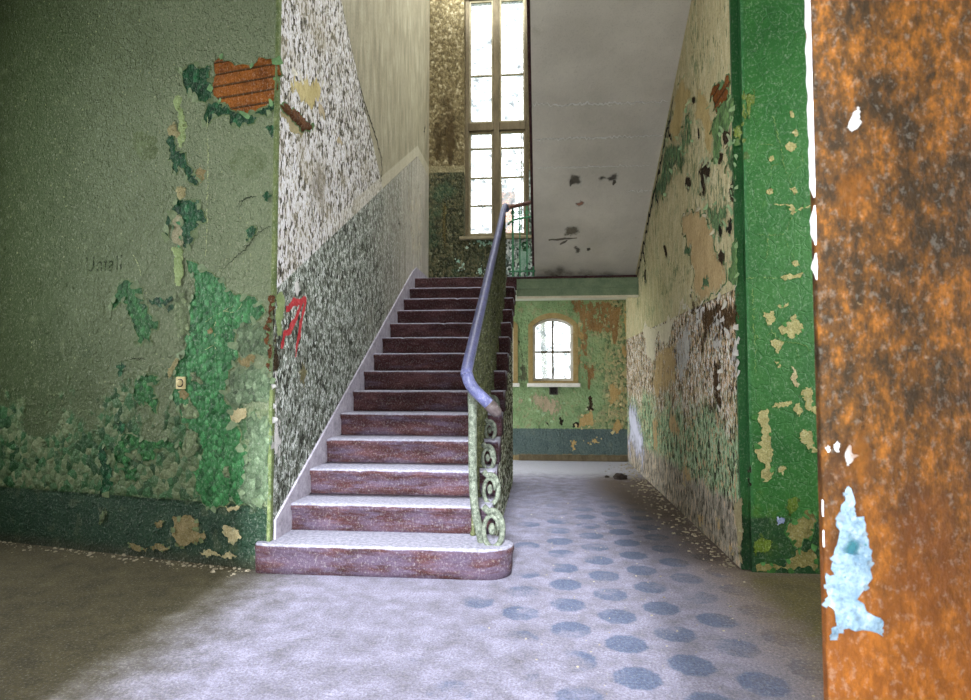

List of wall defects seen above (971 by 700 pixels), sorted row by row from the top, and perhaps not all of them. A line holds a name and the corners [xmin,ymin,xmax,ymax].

peeling [97,53,326,525]
peeling [518,337,529,383]
peeling [517,390,624,451]
spalling [643,73,755,385]
spalling [746,303,816,487]
spalling [127,515,242,559]
spalling [729,497,743,564]
peeling [754,486,884,640]